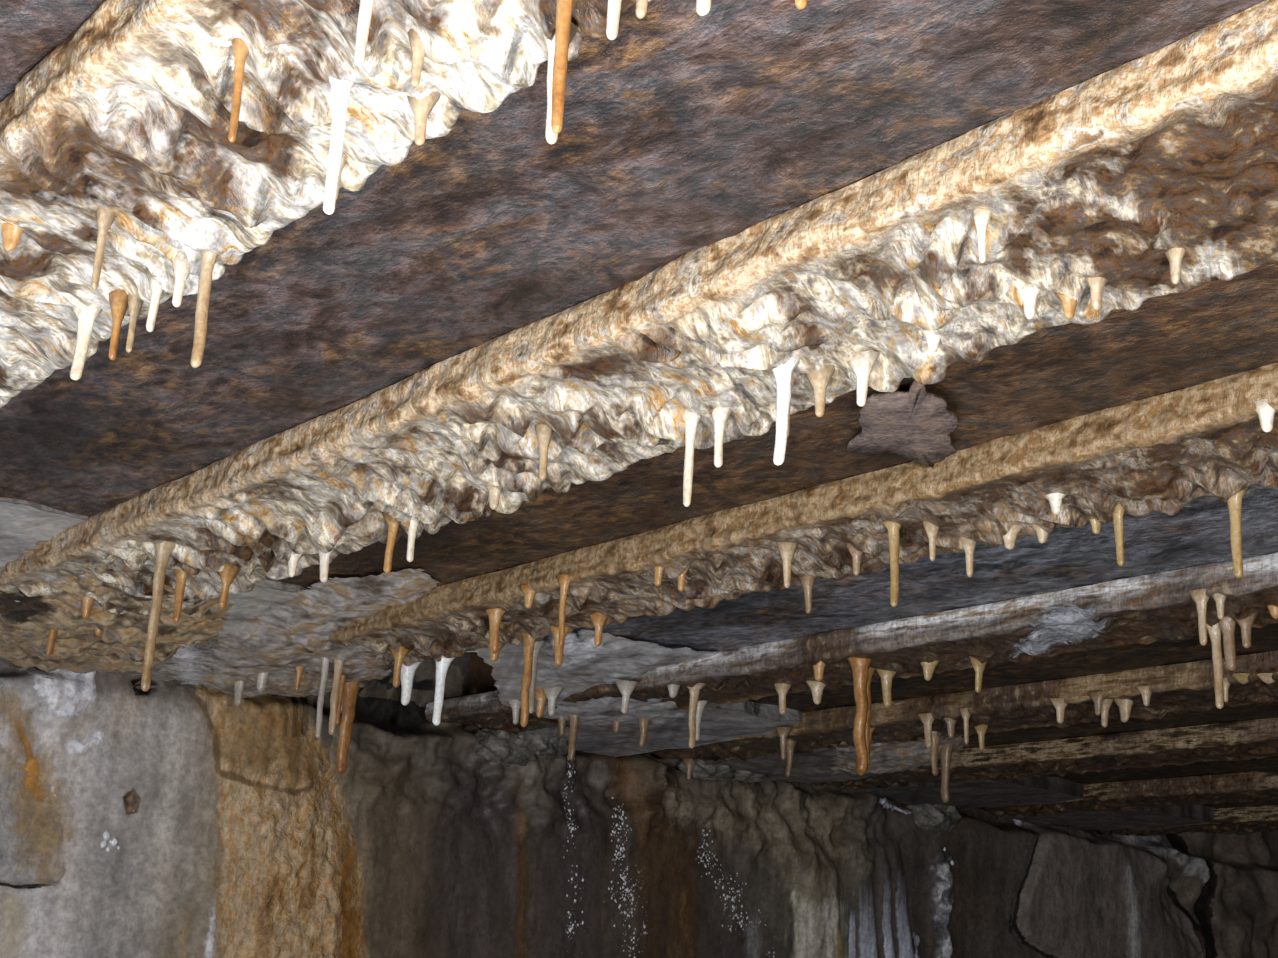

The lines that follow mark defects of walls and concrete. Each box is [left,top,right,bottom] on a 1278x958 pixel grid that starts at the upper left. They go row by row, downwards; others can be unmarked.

water stain [0,0,1278,615]
water stain [294,363,1278,671]
spalling [354,676,435,734]
water stain [367,754,515,958]
water stain [534,768,606,958]
water stain [425,552,1278,733]
water stain [636,650,1278,958]